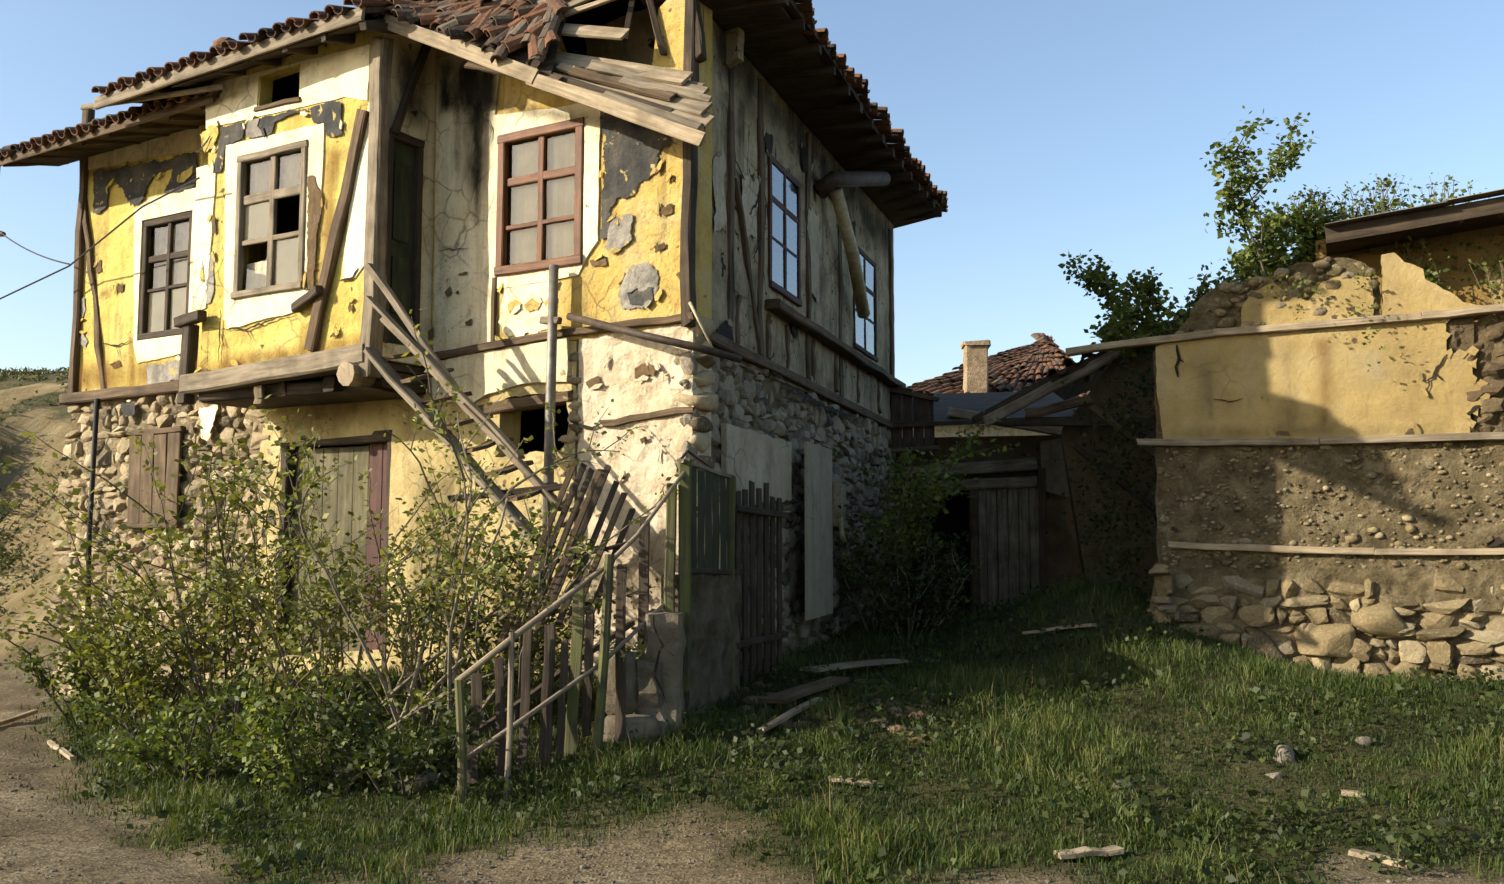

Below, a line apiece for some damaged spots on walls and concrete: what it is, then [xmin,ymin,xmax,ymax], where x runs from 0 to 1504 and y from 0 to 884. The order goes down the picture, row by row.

peeling [93,101,343,214]
peeling [586,112,680,310]
crack [1422,355,1447,391]
spalling [1440,258,1504,433]